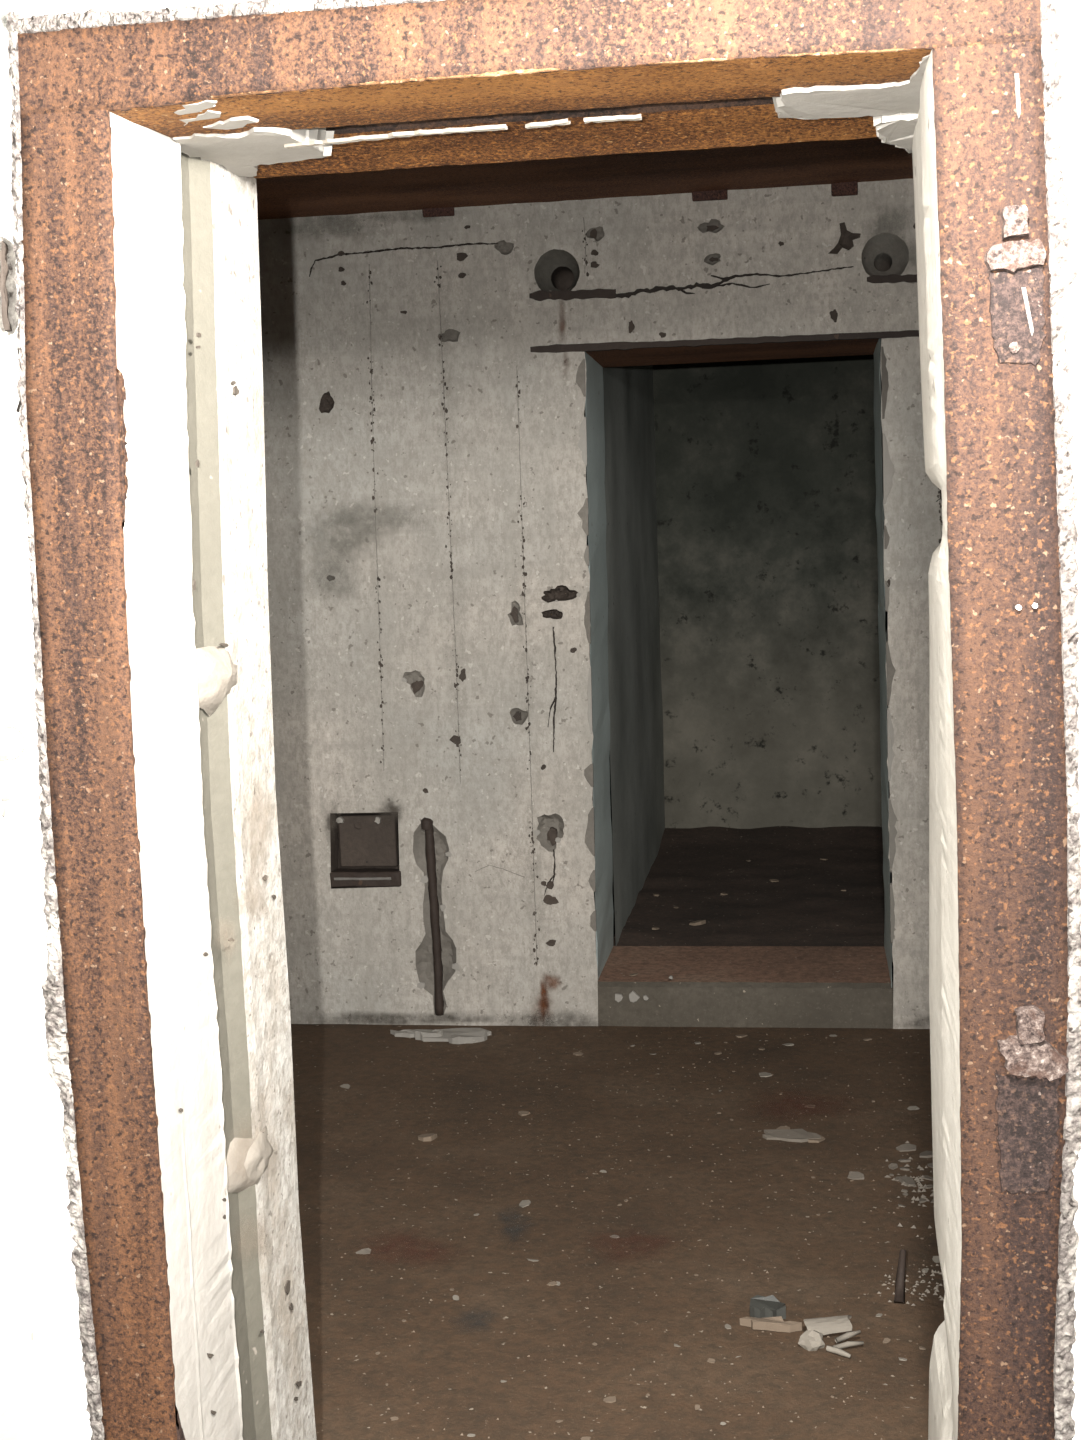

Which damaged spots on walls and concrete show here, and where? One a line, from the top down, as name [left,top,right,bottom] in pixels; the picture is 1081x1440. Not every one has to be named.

peeling [173,100,508,177]
peeling [525,114,642,129]
spalling [828,222,861,254]
crack [616,266,854,298]
spalling [367,357,378,513]
spalling [375,576,384,763]
spalling [402,670,425,697]
spalling [528,813,564,966]
spalling [413,824,459,1015]
corrosion [541,977,557,1016]
peeling [175,1405,186,1440]